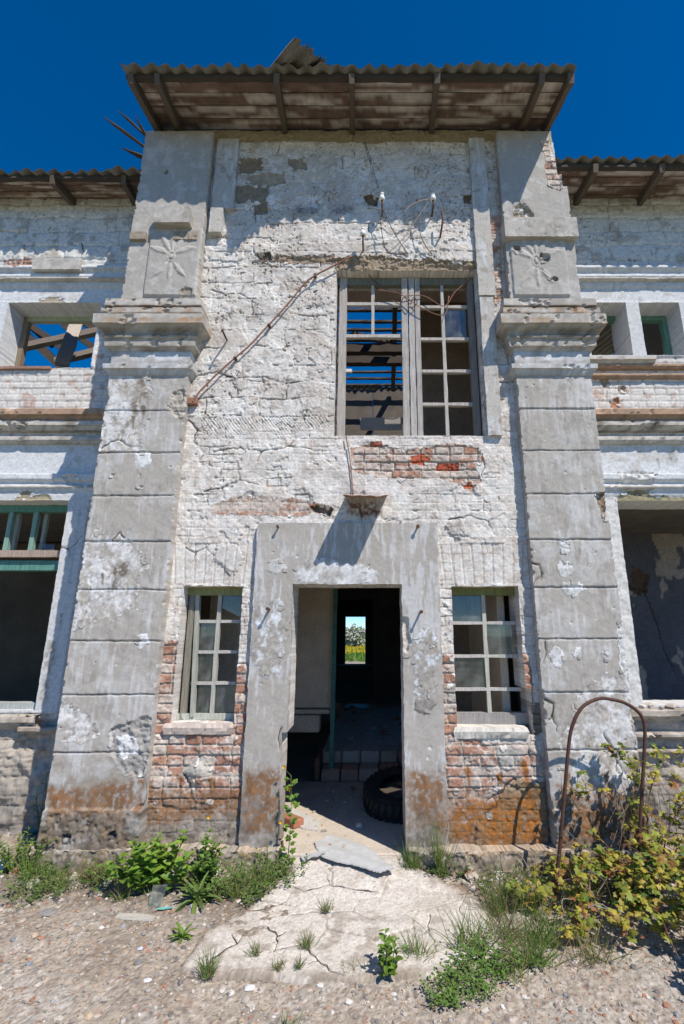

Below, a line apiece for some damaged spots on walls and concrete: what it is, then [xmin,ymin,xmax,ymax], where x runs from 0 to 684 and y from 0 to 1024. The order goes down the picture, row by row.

peeling [235,157,307,215]
spalling [540,140,563,191]
crack [188,420,326,458]
spalling [350,441,484,493]
corrosion [350,503,381,517]
flaking render [557,537,586,597]
spalling [628,565,650,596]
spalling [12,597,291,805]
crack [215,872,393,974]